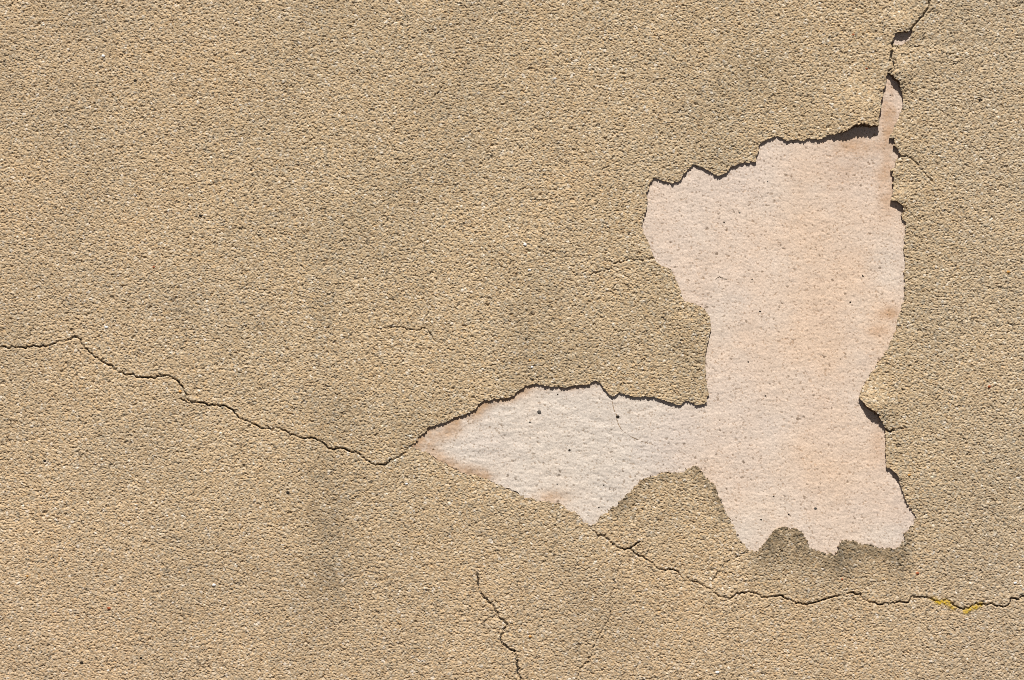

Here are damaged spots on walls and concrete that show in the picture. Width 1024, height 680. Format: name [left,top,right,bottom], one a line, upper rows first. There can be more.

crack [889,0,931,73]
flaking render [411,29,917,555]
crack [3,330,457,469]
crack [600,534,1024,609]
crack [477,572,521,680]